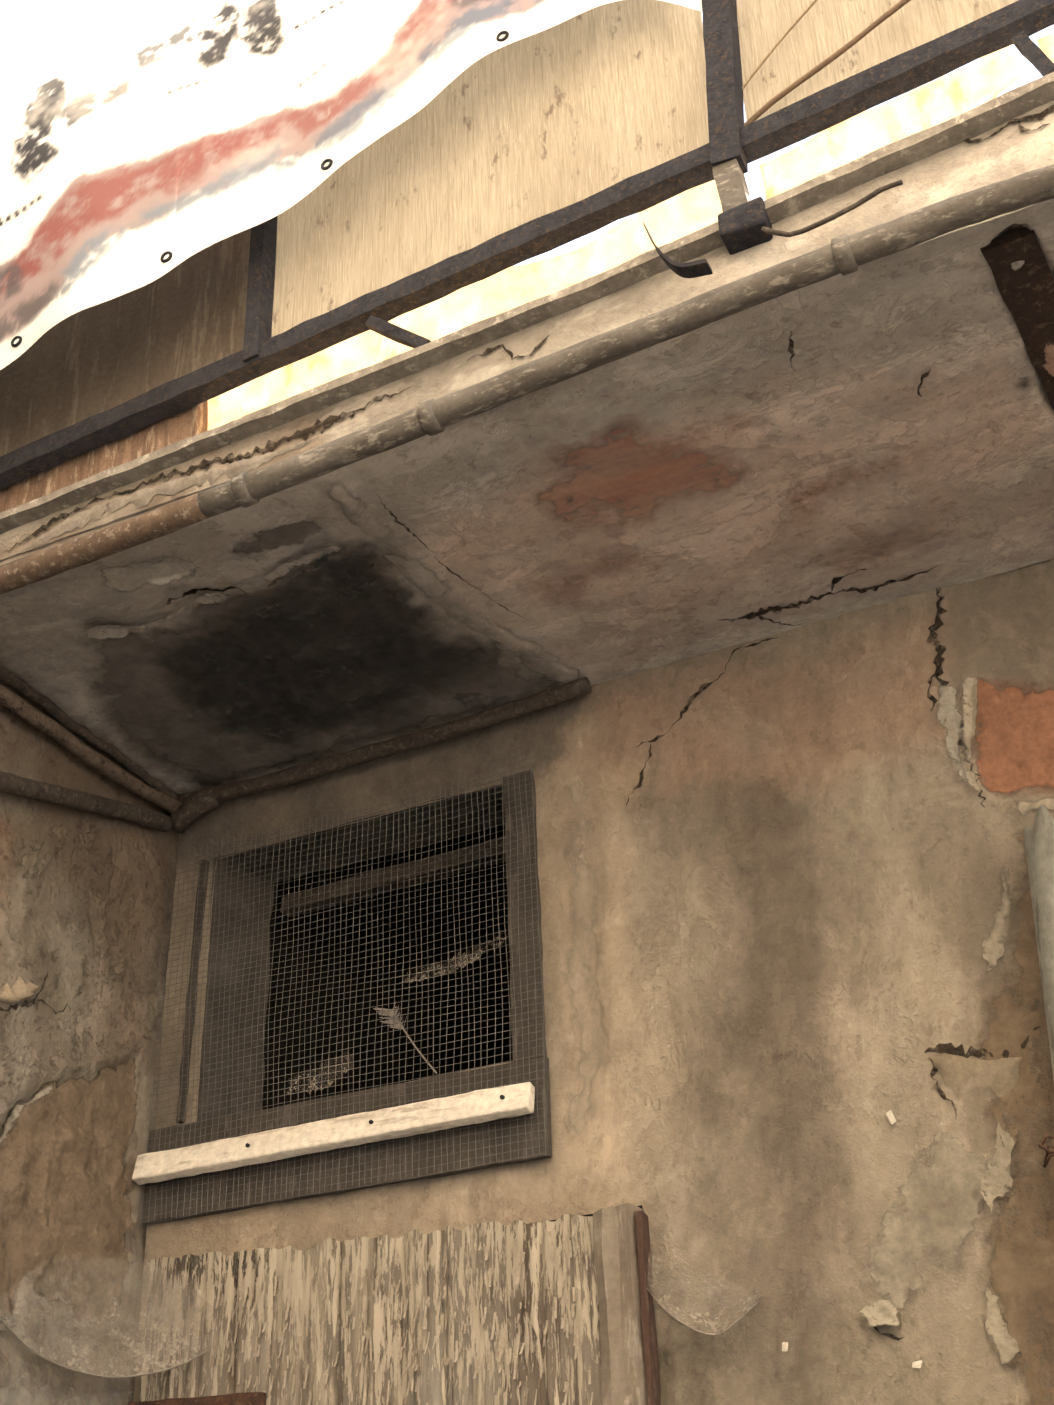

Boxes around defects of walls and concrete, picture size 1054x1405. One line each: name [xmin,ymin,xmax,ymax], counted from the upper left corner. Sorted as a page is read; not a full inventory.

leakage [84,545,546,786]
crack [626,564,986,807]
flaking render [859,677,1054,1405]